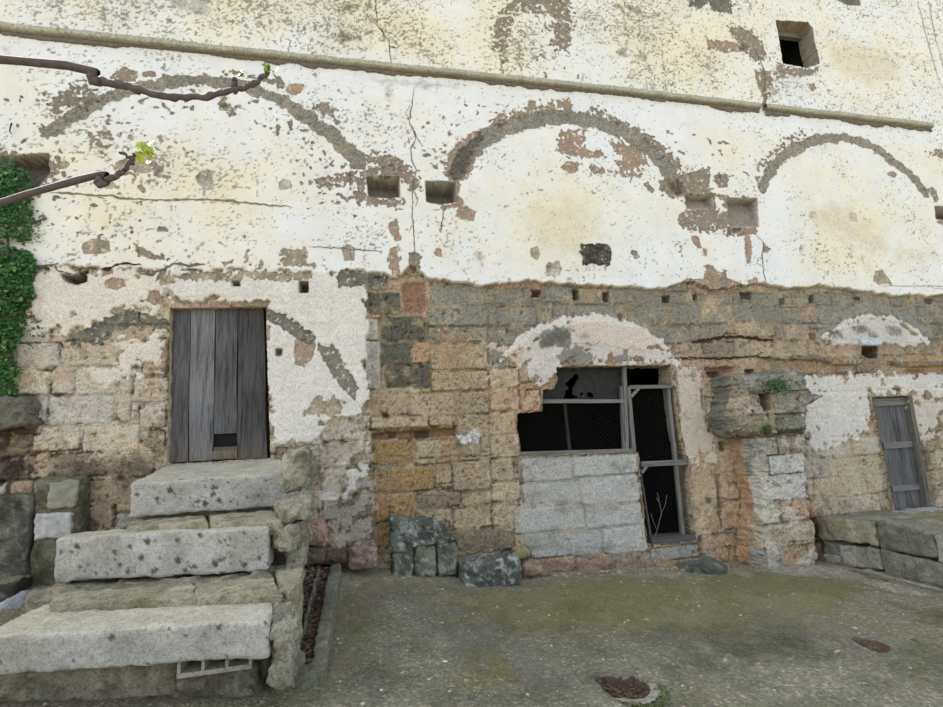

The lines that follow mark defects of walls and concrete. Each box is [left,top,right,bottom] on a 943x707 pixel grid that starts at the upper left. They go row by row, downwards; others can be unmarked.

peeling [110,66,156,82]
crack [370,0,399,58]
peeling [491,0,576,74]
peeling [689,0,819,111]
peeling [0,148,79,217]
peeling [4,79,196,205]
flaking render [195,170,214,190]
crack [405,85,423,264]
peeling [556,105,810,295]
peeling [69,216,317,349]
peeling [267,309,359,417]